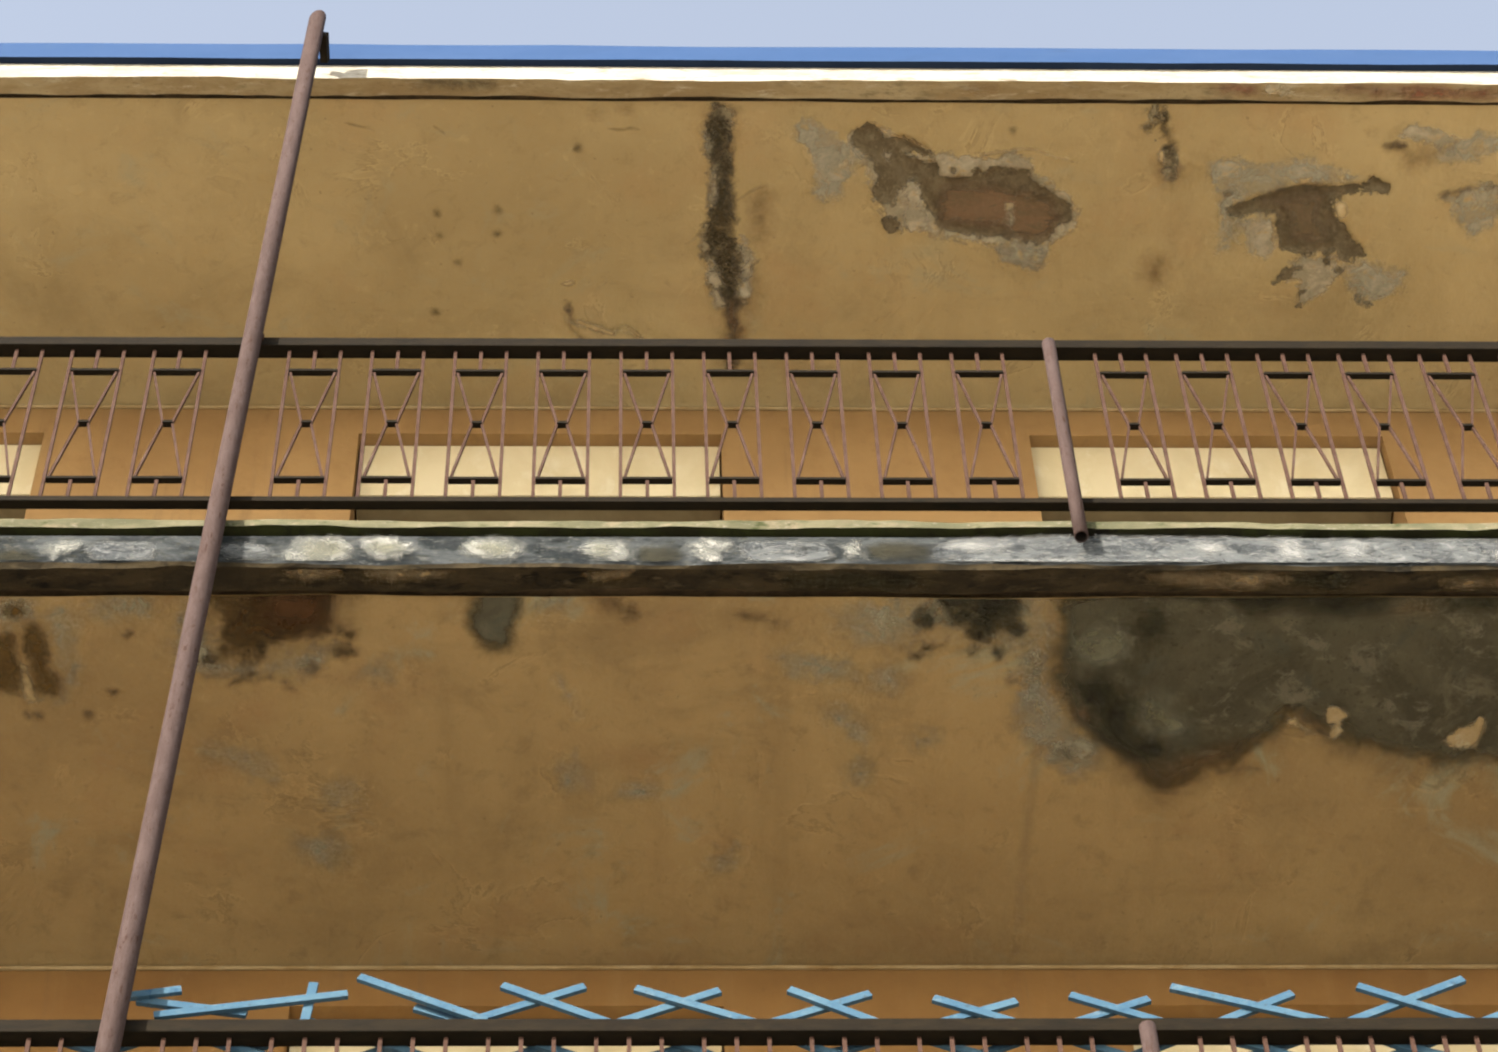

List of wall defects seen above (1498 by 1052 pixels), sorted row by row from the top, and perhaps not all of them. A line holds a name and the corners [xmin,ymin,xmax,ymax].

crack [1143,104,1178,180]
peeling [1387,123,1498,162]
spalling [795,120,1081,270]
crack [698,102,754,369]
spalling [1211,159,1405,308]
damp [0,541,80,560]
damp [284,537,411,561]
damp [464,539,519,557]
damp [583,539,729,561]
damp [845,542,929,559]
damp [469,597,522,650]
damp [851,573,1498,788]